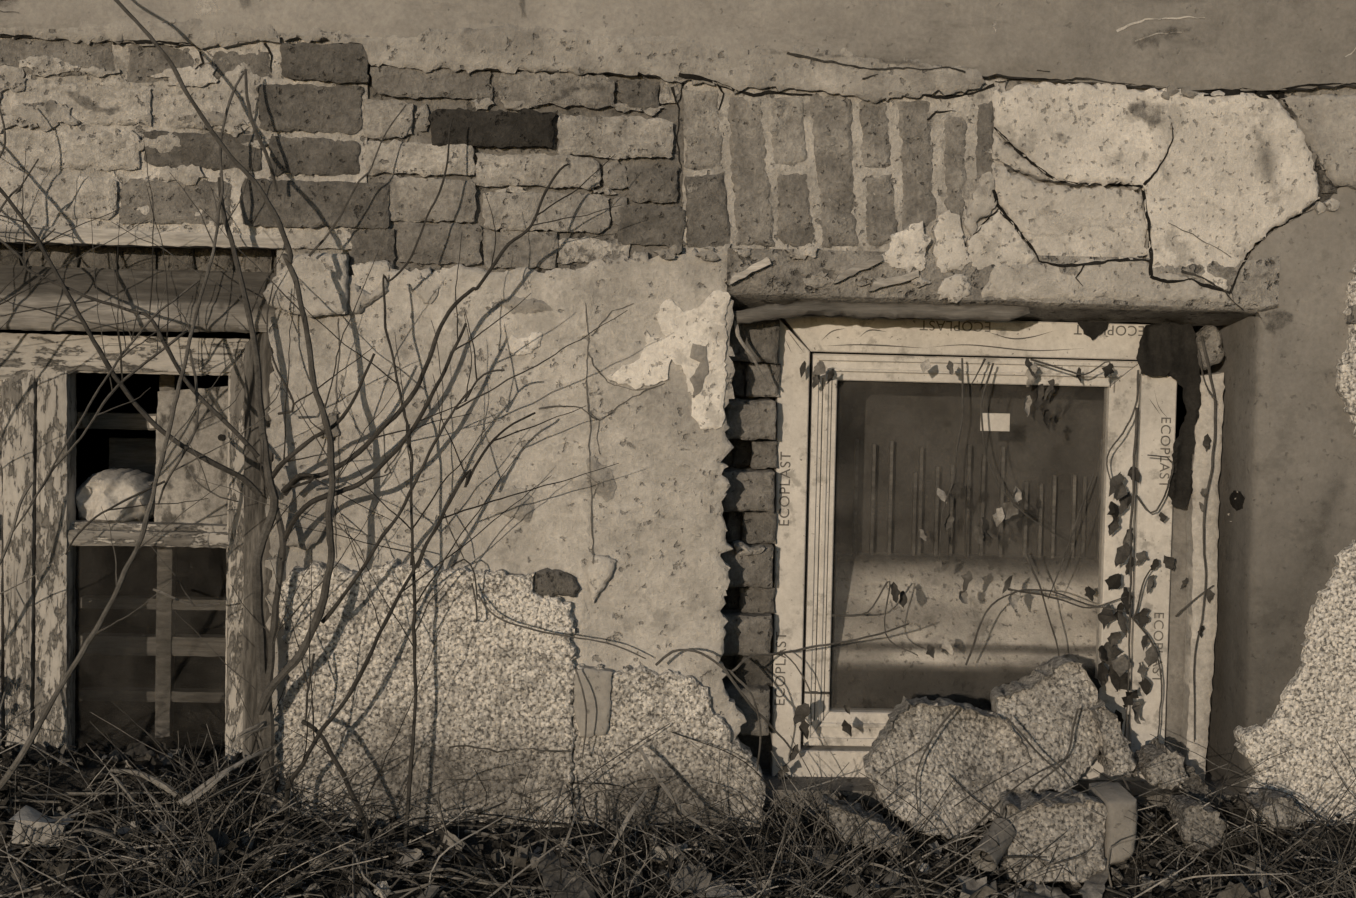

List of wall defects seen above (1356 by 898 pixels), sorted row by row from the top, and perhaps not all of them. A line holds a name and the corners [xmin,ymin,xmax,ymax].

crack [670,73,812,168]
crack [787,52,1166,120]
crack [1204,82,1356,107]
flaking render [0,38,751,317]
crack [969,122,1301,311]
peeling [509,332,543,355]
peeling [607,272,744,430]
flaking render [786,82,1356,726]
flaking render [286,480,329,550]
spalling [535,567,580,598]
spalling [574,665,613,738]